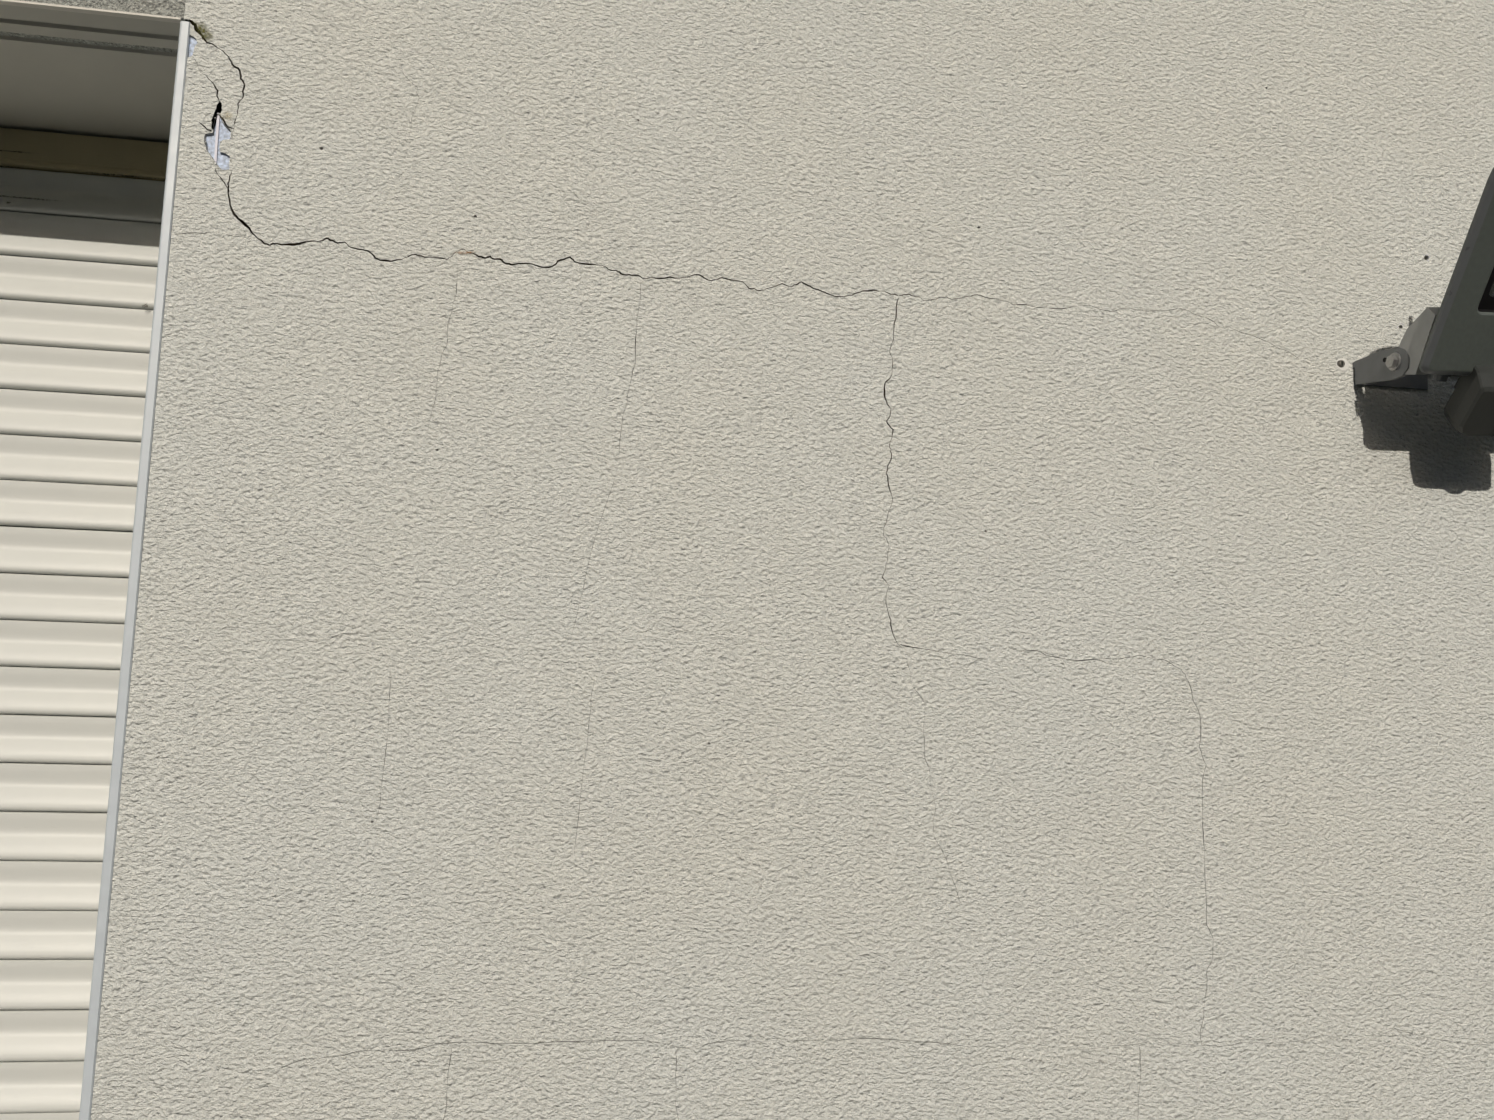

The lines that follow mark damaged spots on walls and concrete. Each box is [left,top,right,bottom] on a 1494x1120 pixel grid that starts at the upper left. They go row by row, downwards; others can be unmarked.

crack [189,20,245,131]
crack [182,169,1296,898]
crack [276,649,1482,1120]